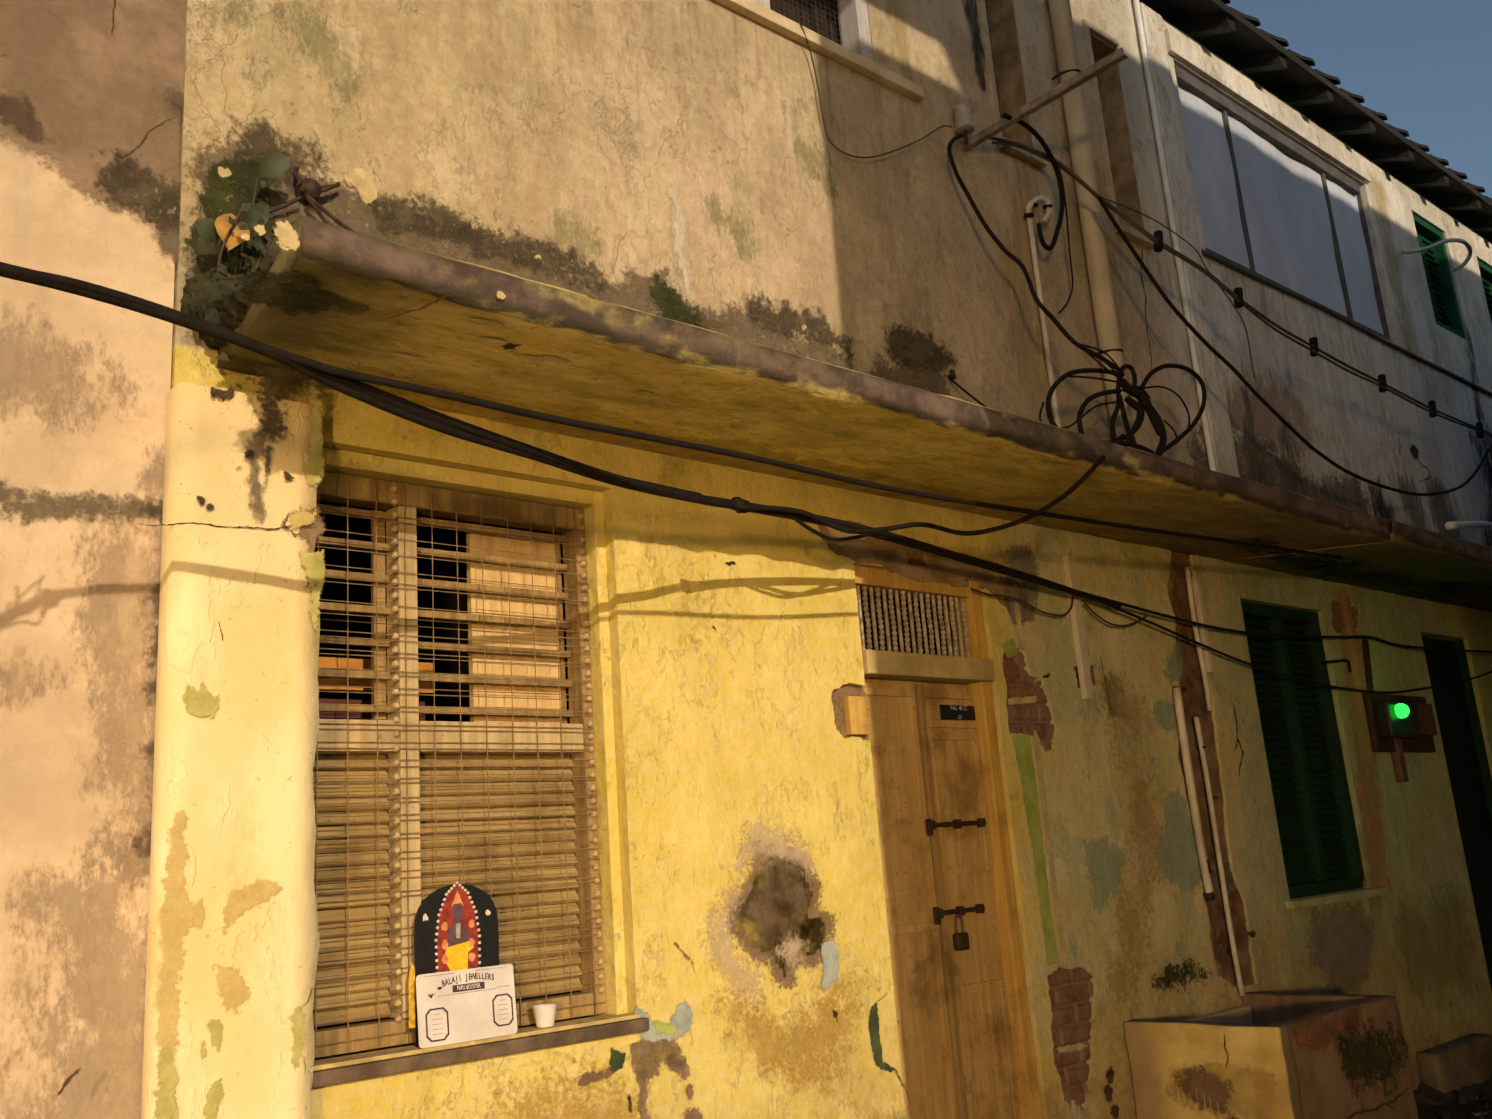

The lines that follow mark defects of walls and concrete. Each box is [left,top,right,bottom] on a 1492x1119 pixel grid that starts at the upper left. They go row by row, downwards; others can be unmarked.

crack [109,0,117,33]
leakage [964,0,986,90]
leakage [0,0,957,396]
leakage [1190,424,1210,470]
leakage [1226,375,1464,540]
crack [137,522,317,530]
spalling [281,508,326,630]
spalling [1152,551,1254,986]
peeling [154,810,205,1119]
spalling [627,1001,703,1119]
spalling [1047,967,1094,1110]
leakage [1168,1065,1272,1119]